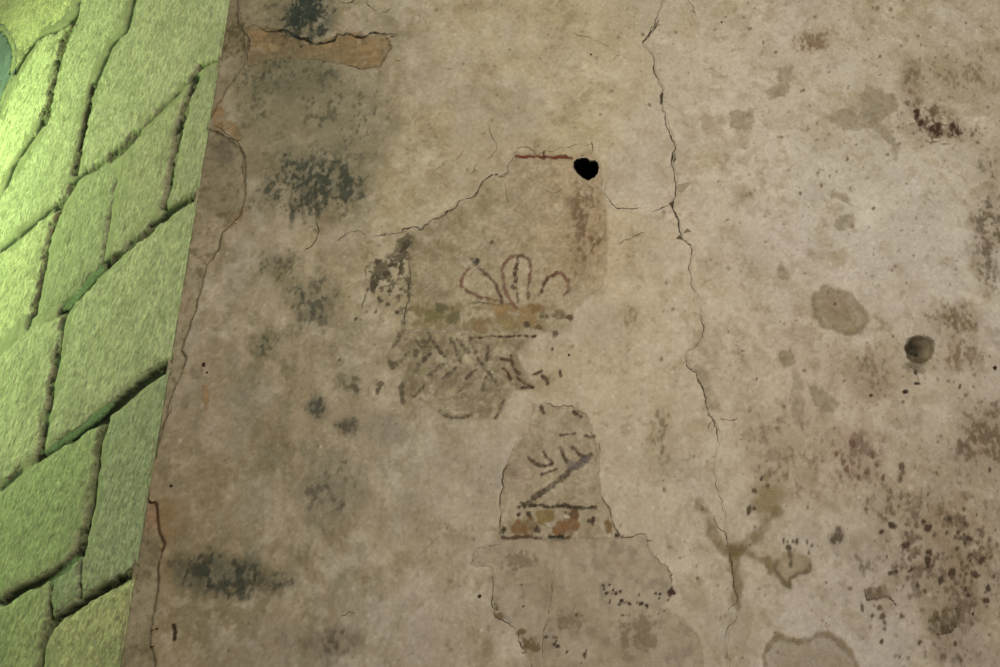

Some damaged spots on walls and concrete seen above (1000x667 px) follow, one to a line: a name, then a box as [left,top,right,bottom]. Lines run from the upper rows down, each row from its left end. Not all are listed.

water stain [281,0,335,37]
water stain [901,98,978,143]
water stain [264,152,364,215]
crack [304,126,593,251]
crack [604,0,741,666]
flaking render [903,336,935,394]
water stain [957,401,1000,471]
water stain [179,552,293,600]
peeling [473,533,703,667]
water stain [765,538,813,587]
water stain [879,462,998,661]
water stain [764,631,859,667]